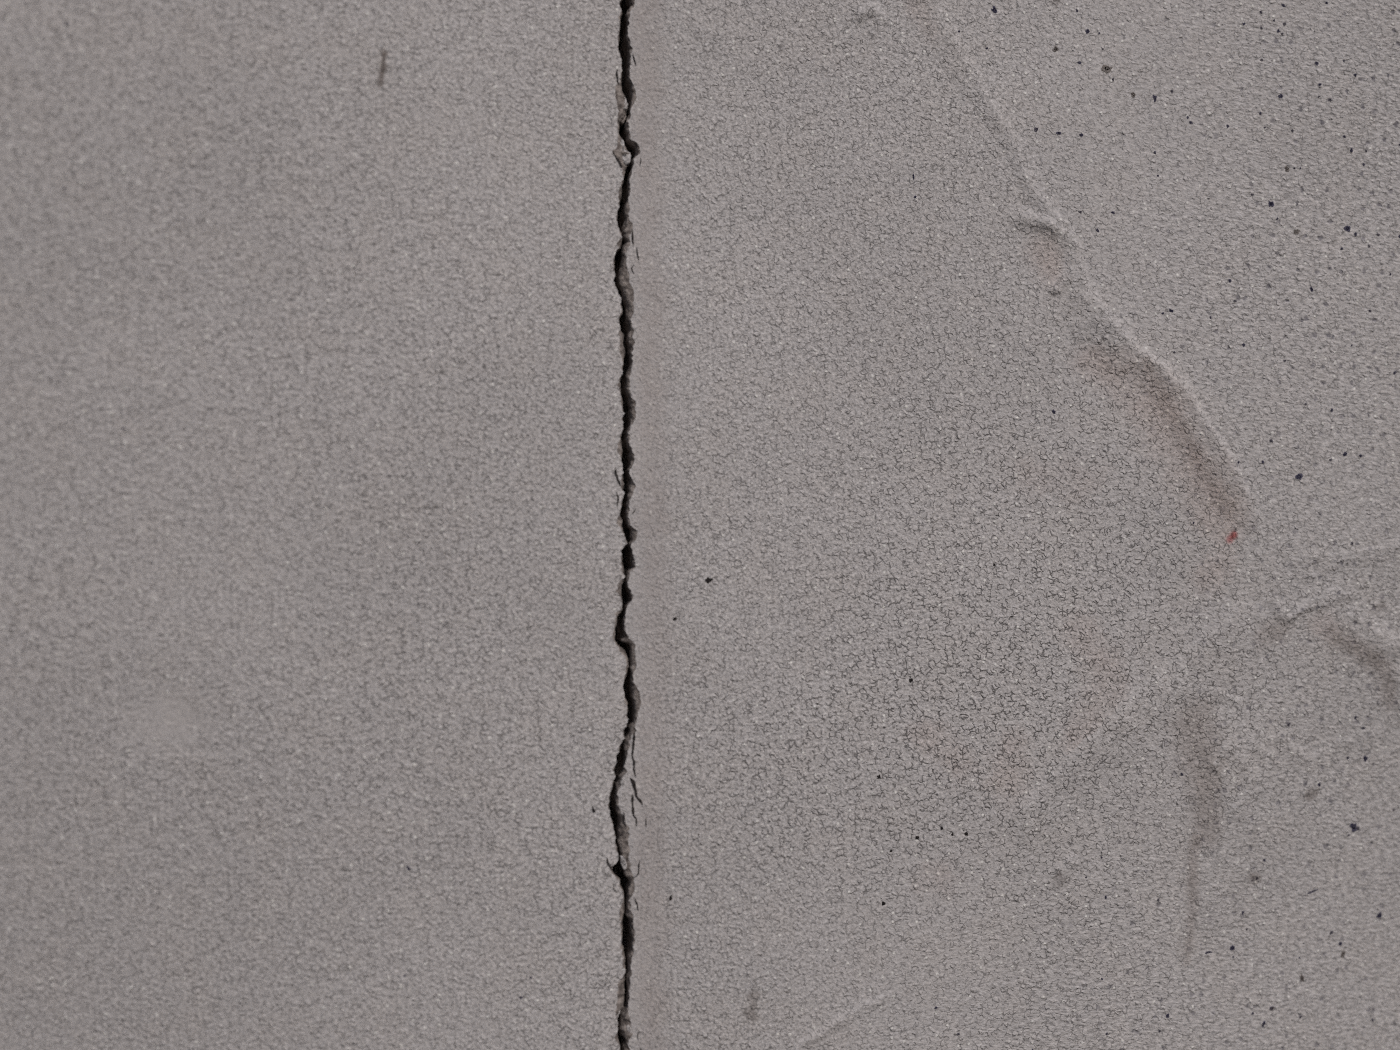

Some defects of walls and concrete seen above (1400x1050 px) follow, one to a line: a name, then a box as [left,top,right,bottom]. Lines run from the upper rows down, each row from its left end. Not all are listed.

crack [607,0,647,1050]